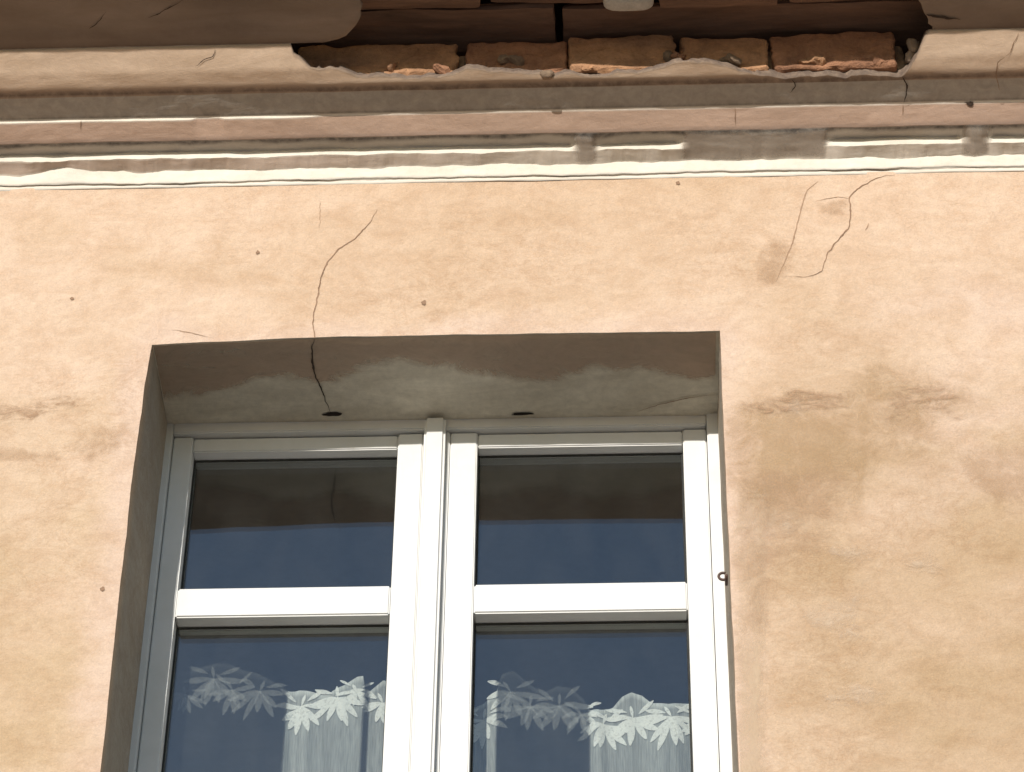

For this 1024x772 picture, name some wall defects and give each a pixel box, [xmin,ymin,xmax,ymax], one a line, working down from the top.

flaking render [298,31,919,76]
crack [776,175,892,281]
crack [311,210,377,413]